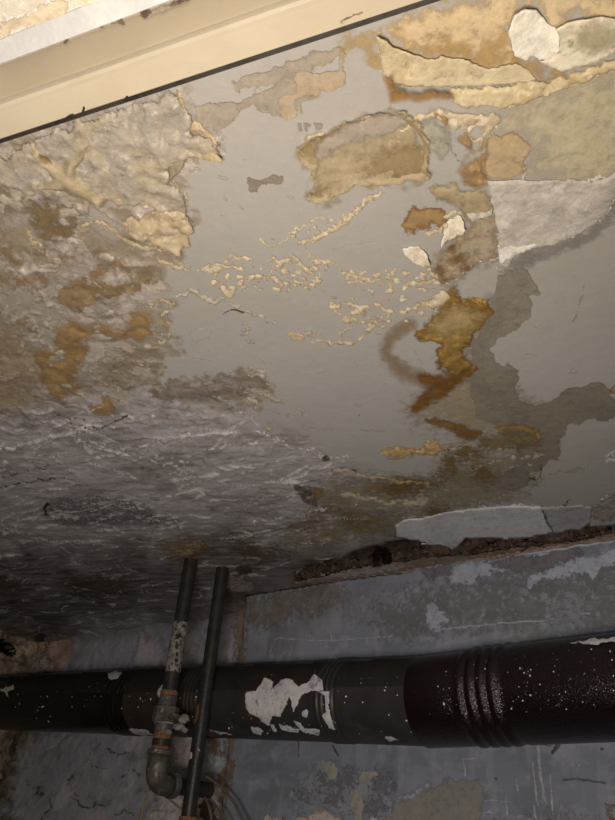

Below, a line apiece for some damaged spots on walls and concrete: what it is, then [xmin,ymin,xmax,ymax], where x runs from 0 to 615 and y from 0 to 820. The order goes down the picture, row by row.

peeling [0,9,615,346]
rust [382,135,499,413]
flaking render [152,365,304,417]
leakage [233,198,615,565]
flaking render [293,484,324,507]
rust [366,417,542,500]
peeling [292,489,615,589]
peeling [424,597,449,632]
peeling [288,755,431,820]